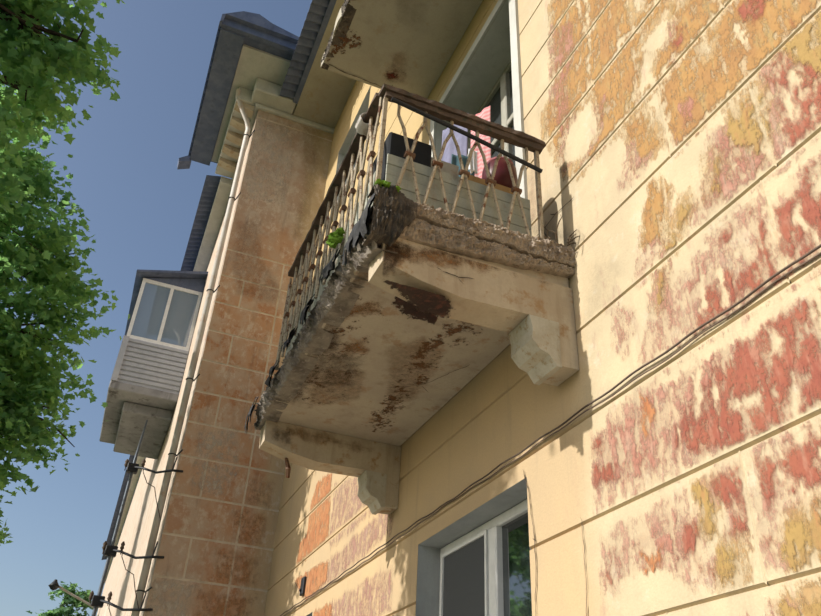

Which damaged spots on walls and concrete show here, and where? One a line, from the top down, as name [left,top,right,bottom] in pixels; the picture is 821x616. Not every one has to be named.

peeling [327,26,361,61]
peeling [540,0,821,362]
spalling [254,206,397,430]
spalling [370,280,482,432]
peeling [591,300,821,512]
peeling [295,473,393,600]
peeling [313,573,391,616]
peeling [600,433,821,591]
peeling [770,578,821,616]